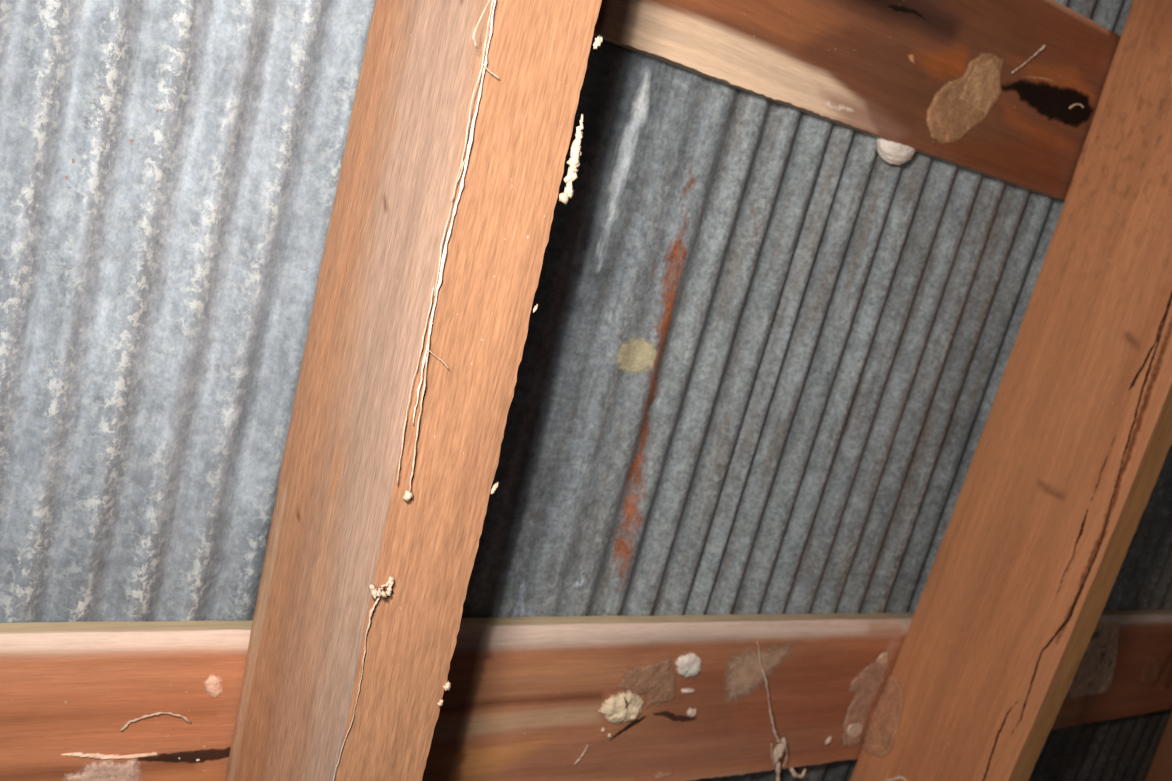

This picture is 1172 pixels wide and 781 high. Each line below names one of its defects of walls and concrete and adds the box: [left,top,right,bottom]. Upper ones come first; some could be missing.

rust [615,239,686,577]
crack [982,292,1172,781]